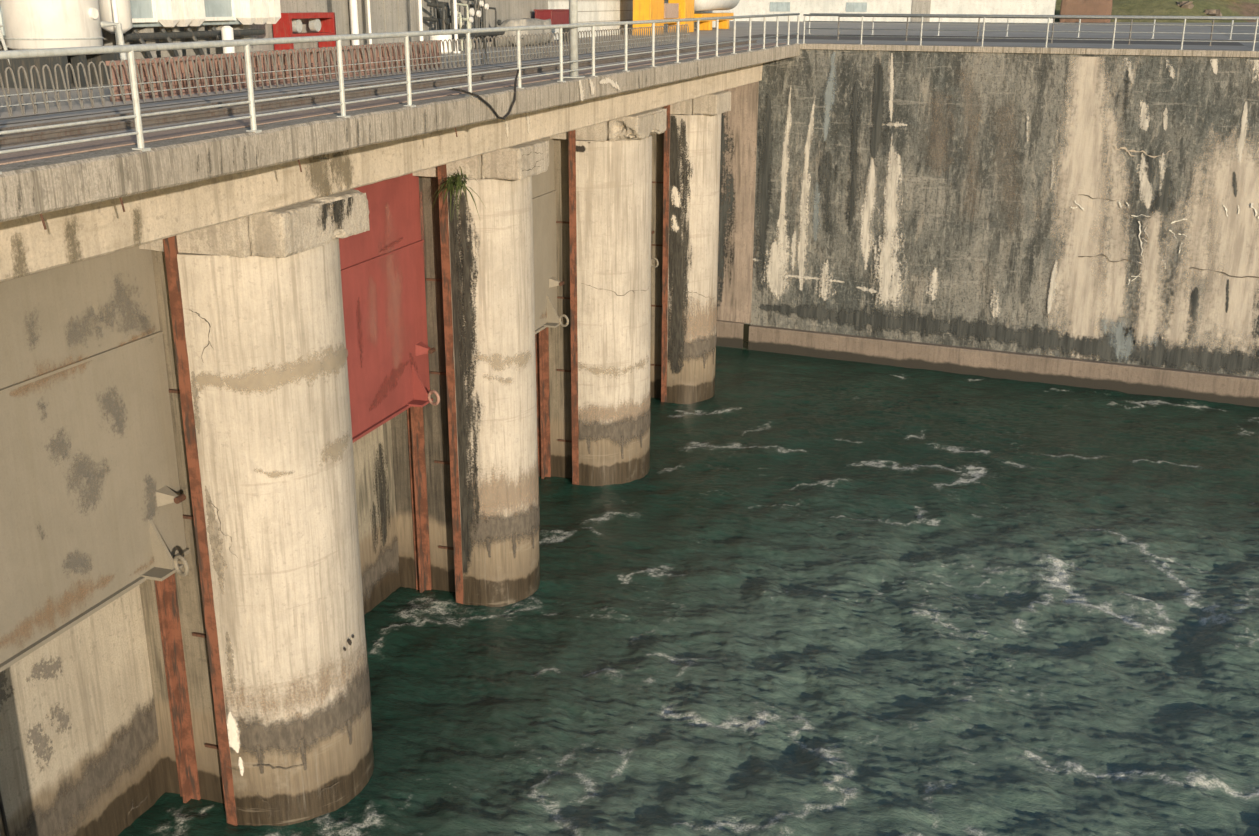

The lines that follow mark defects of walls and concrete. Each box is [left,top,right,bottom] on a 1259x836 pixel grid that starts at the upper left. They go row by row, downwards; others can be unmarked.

water stain [667,112,735,374]
water stain [753,52,1259,376]
water stain [447,183,540,573]
water stain [0,671,13,704]
water stain [28,657,62,681]
water stain [16,698,159,836]
water stain [224,644,372,774]